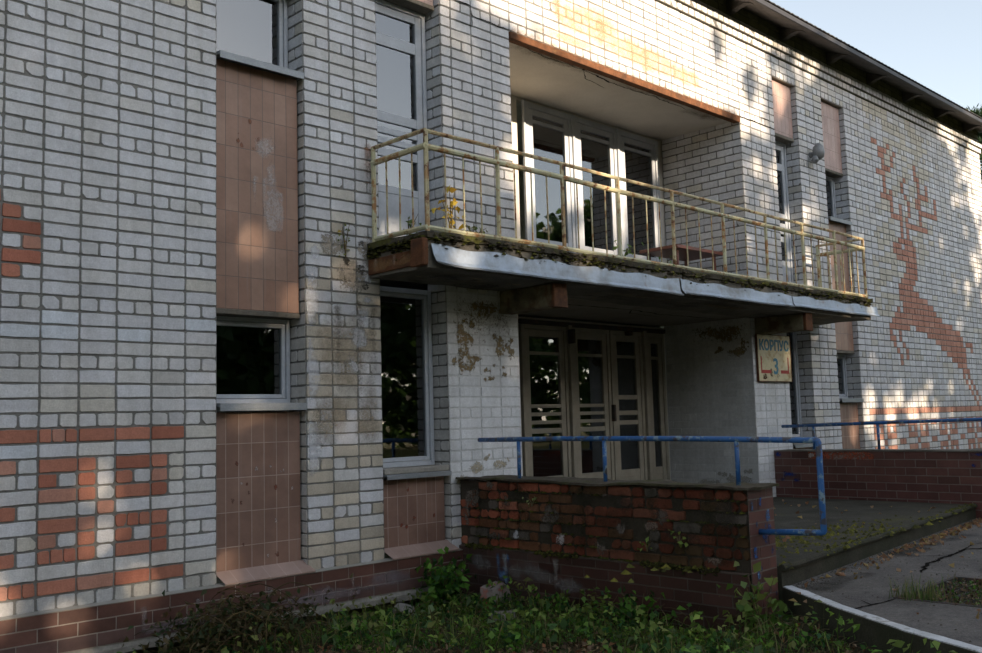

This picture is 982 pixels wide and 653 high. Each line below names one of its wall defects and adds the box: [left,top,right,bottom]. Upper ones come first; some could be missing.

damp [557,8,698,86]
peeling [452,299,515,381]
crack [920,543,982,572]